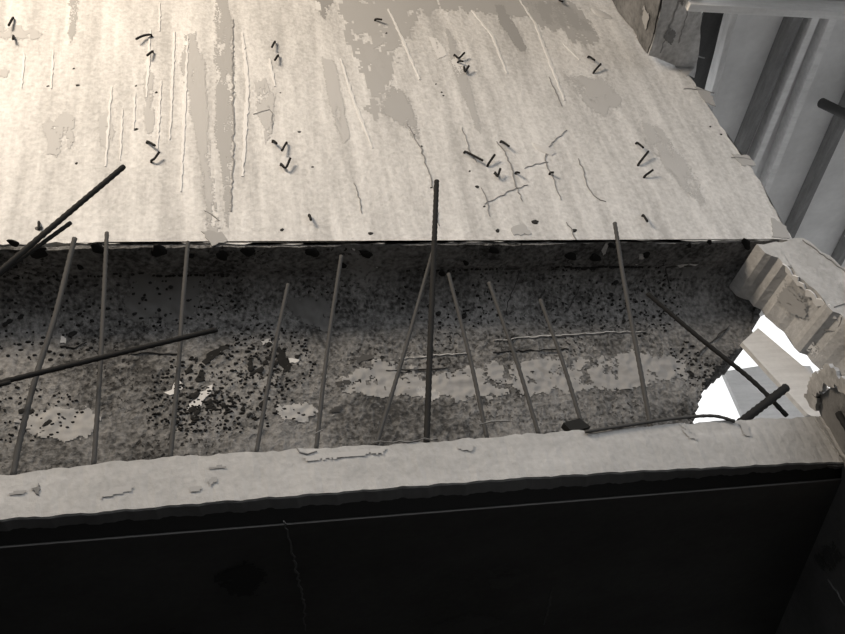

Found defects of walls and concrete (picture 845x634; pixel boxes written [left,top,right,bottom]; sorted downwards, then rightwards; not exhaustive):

leakage [317,0,622,148]
crack [407,124,434,191]
crack [481,130,567,216]
crack [578,158,606,202]
spalling [731,153,755,167]
spalling [240,255,343,452]
peeling [340,179,791,446]
spalling [804,342,845,456]